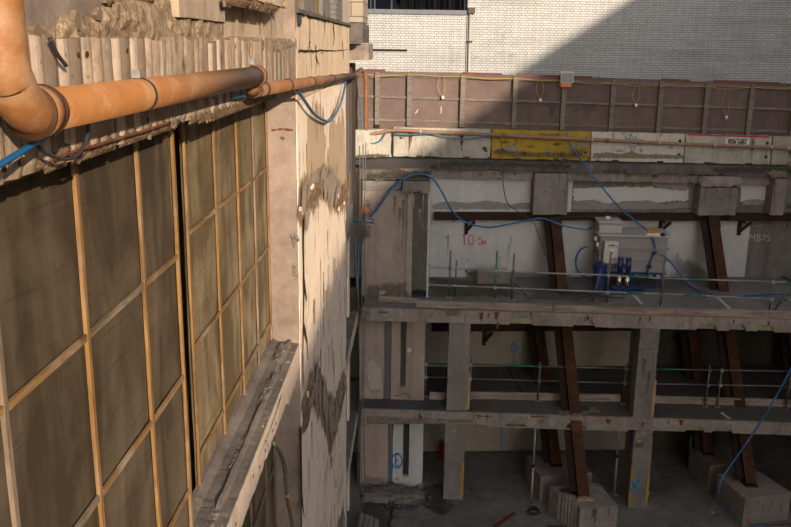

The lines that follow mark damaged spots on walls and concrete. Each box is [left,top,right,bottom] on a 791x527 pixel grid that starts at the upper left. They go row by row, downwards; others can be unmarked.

peeling [299,92,350,216]
peeling [308,257,337,336]
spalling [302,351,345,527]